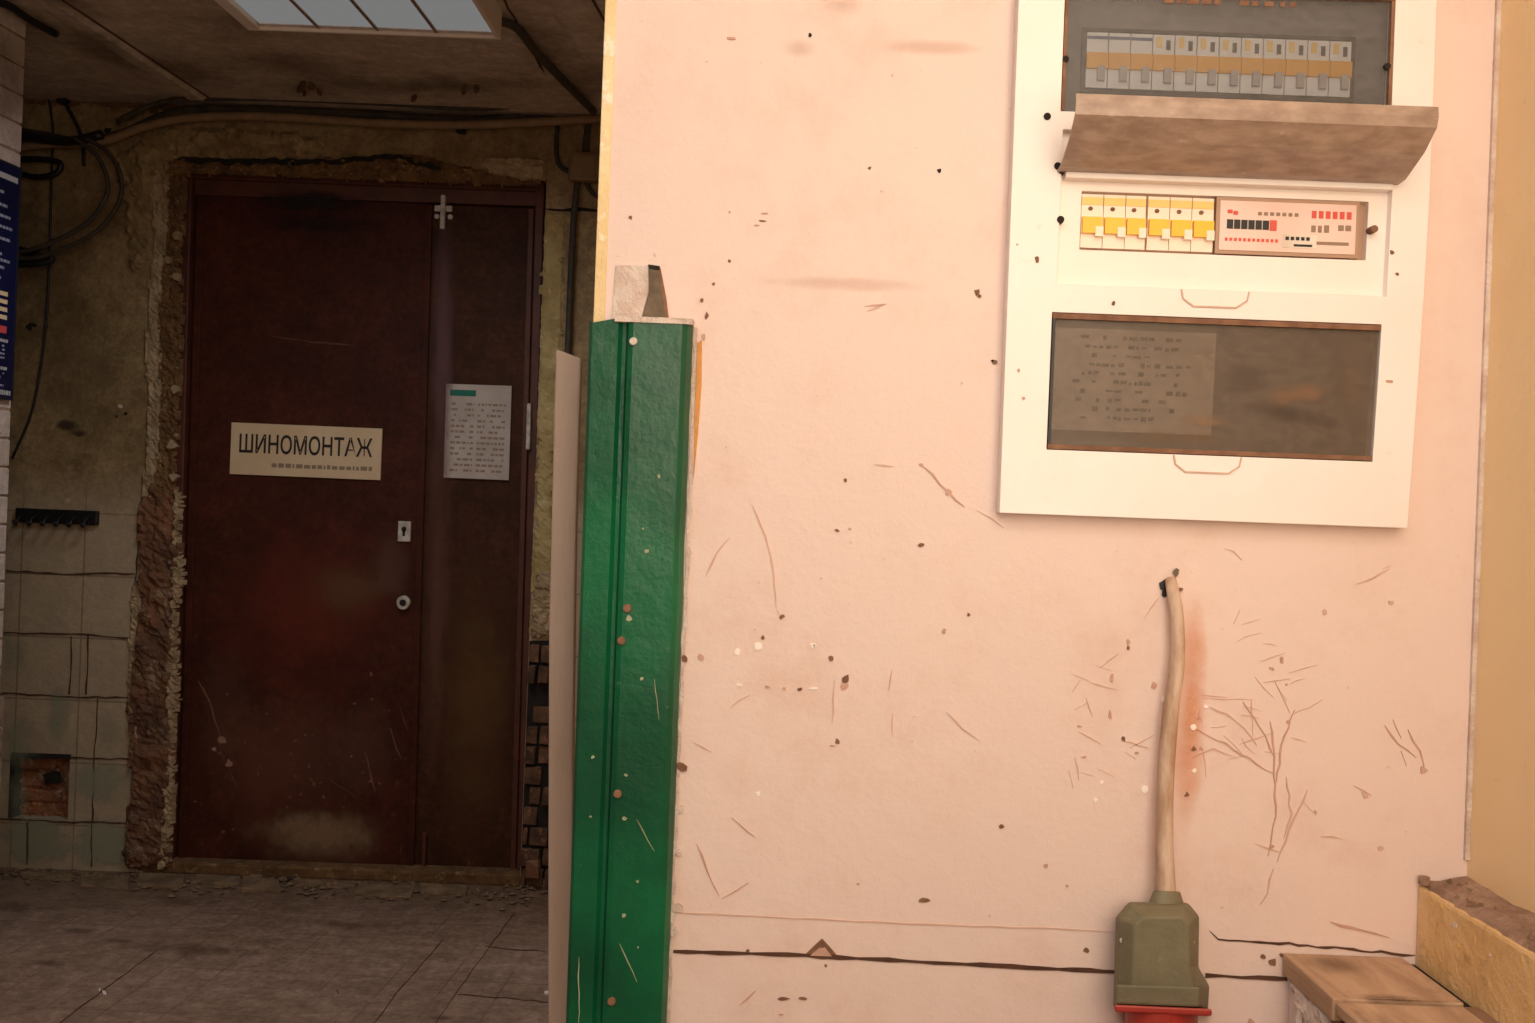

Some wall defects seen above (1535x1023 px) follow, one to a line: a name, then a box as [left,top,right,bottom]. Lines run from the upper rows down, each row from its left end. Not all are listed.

flaking render [8,153,541,870]
peeling [520,212,567,888]